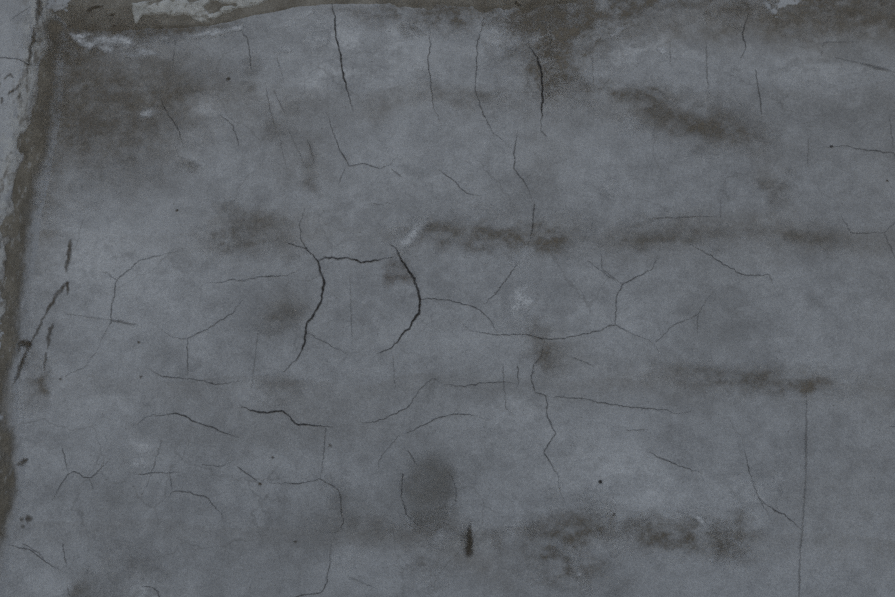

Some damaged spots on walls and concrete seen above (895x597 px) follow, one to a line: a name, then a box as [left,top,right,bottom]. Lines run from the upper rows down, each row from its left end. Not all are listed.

flaking render [132,0,267,23]
crack [332,7,352,106]
crack [530,48,544,117]
flaking render [764,0,802,18]
spalling [0,0,71,400]
crack [290,224,518,365]
crack [245,407,325,427]
spalling [0,414,27,540]